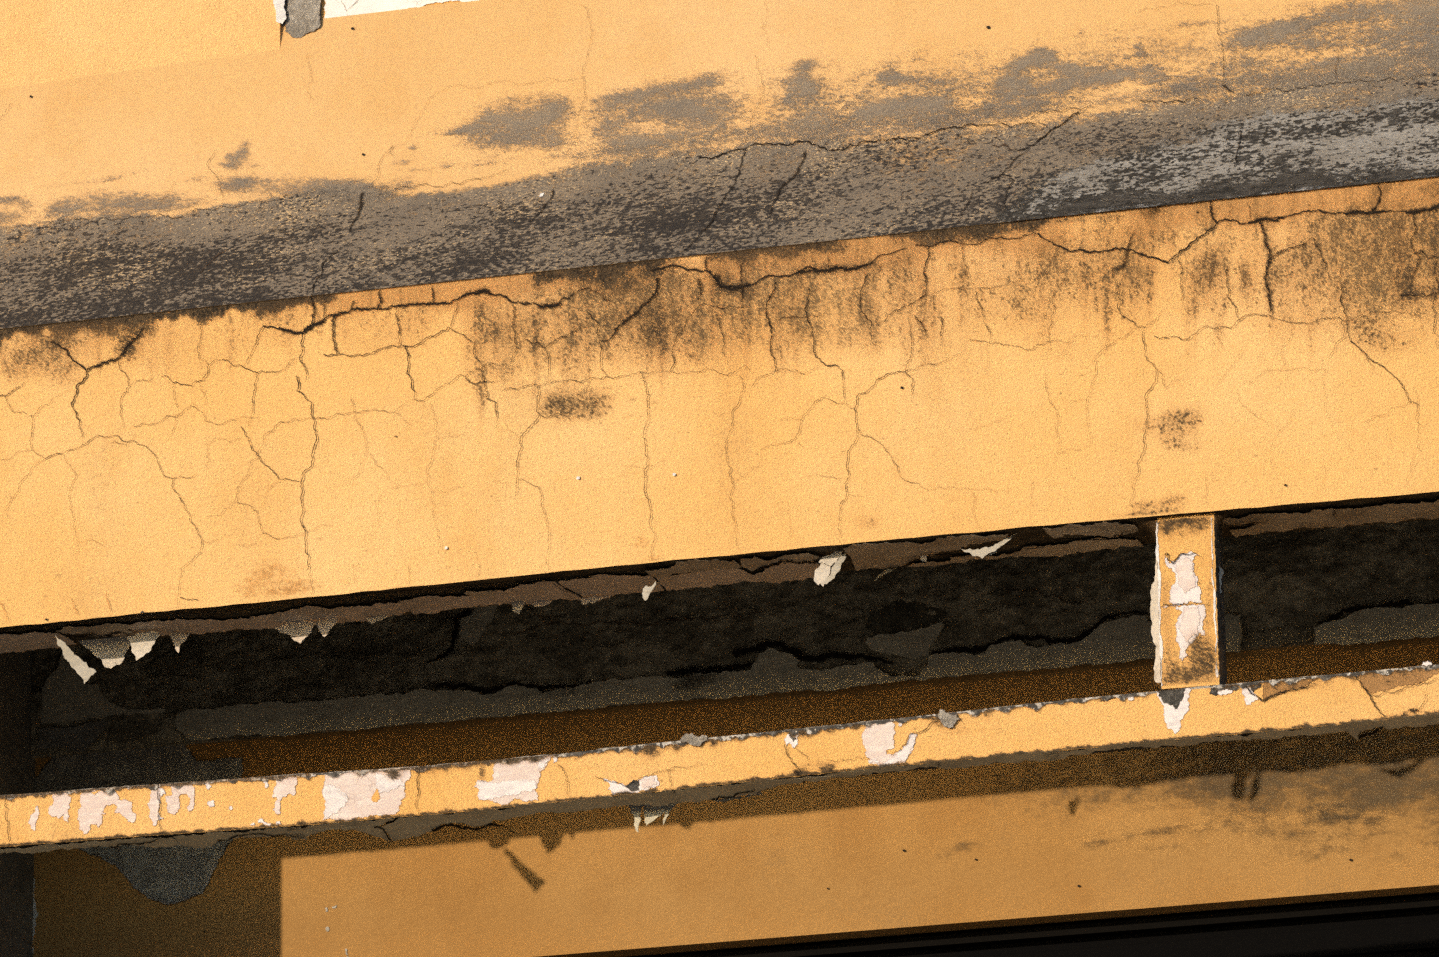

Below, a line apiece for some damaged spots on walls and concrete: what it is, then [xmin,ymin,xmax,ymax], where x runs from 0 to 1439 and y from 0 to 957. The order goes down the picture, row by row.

water stain [0,0,1439,421]
crack [0,55,1439,676]
crack [1140,2,1434,103]
crack [426,608,591,693]
peeling [0,500,1439,905]
water stain [0,708,1439,846]